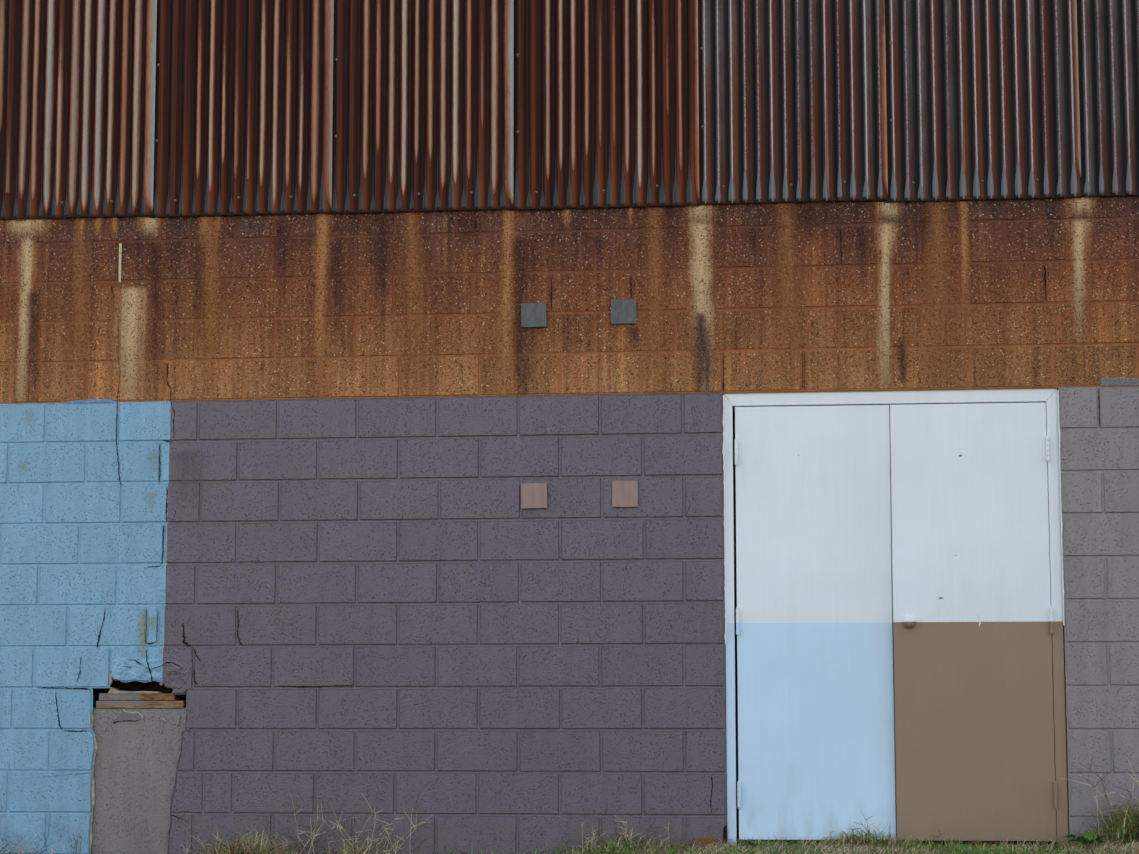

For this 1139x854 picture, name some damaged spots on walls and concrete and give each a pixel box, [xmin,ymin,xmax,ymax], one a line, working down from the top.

rust [6,0,157,213]
rust [196,0,334,209]
rust [363,0,514,204]
rust [545,0,699,199]
water stain [7,218,50,390]
water stain [116,288,147,387]
crack [165,363,175,432]
water stain [689,204,714,391]
water stain [878,202,898,372]
crack [55,612,105,732]
spalling [108,657,163,694]
crack [114,609,181,685]